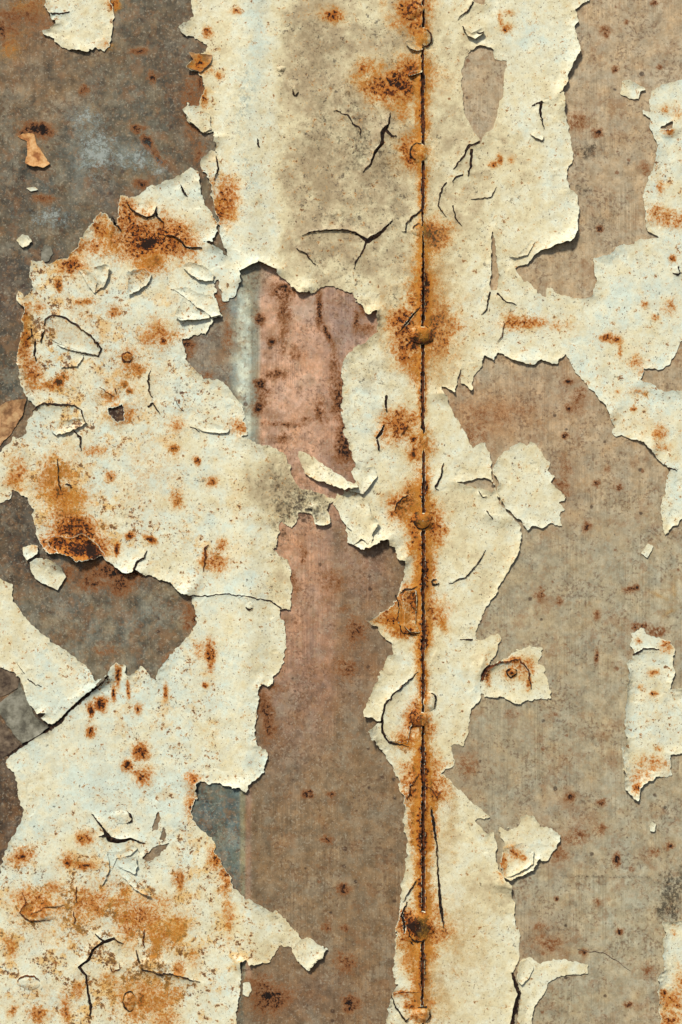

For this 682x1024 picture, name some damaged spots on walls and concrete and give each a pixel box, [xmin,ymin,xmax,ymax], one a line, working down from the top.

peeling [0,0,227,452]
rust [54,179,200,293]
crack [296,141,496,269]
peeling [509,0,682,299]
rust [7,454,157,597]
rust [340,0,463,1024]
crack [7,675,109,757]
peeling [0,490,197,873]
peeling [441,353,682,1024]
crack [91,814,144,843]
rust [10,872,188,960]
crack [19,887,199,1019]